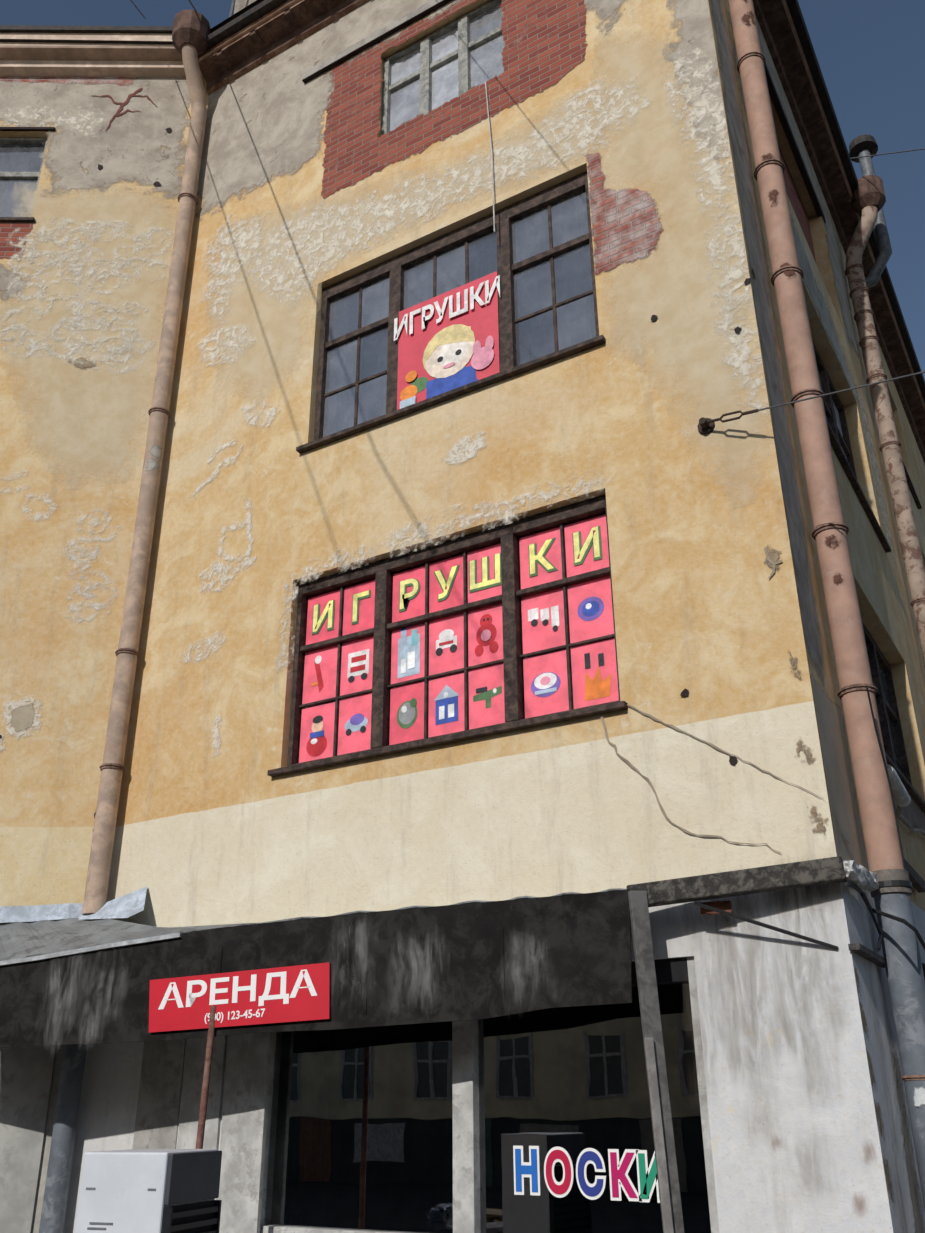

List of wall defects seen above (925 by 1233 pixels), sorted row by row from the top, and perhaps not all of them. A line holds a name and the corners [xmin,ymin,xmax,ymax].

flaking render [0,76,191,199]
crack [91,88,157,130]
flaking render [196,0,663,366]
peeling [0,218,172,374]
flaking render [662,0,823,680]
peeling [199,498,256,591]
peeling [275,480,601,668]
crack [600,704,856,864]
flaking render [796,740,816,764]
flaking render [810,806,828,834]
flaking render [855,966,884,1135]
flaking render [884,1160,894,1202]